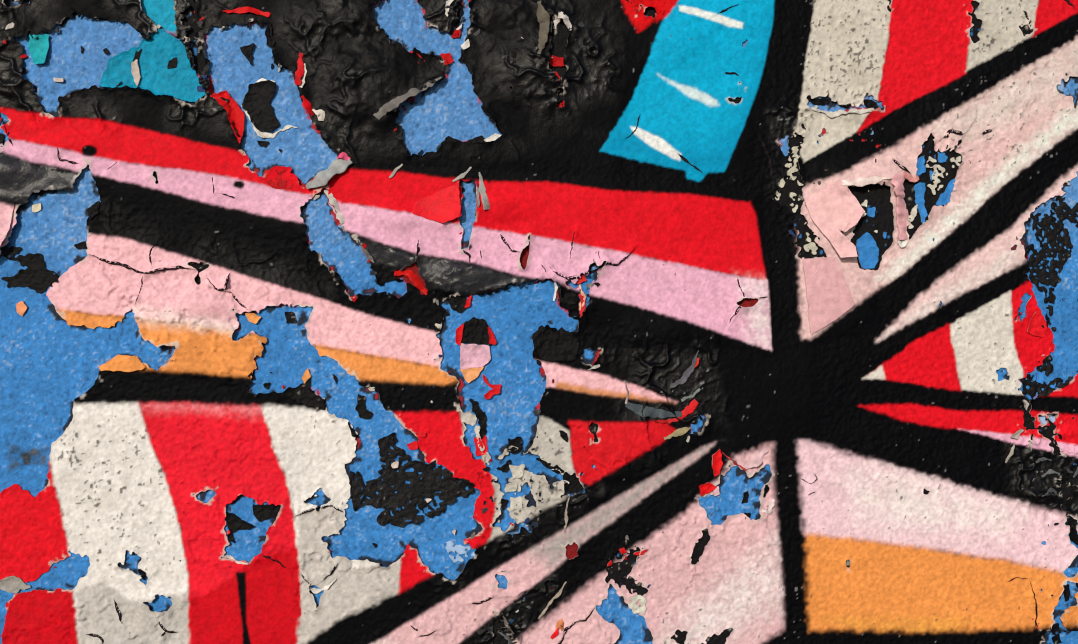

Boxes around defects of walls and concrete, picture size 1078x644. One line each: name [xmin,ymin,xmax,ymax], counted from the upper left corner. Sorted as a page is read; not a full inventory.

peeling [807,93,884,144]
peeling [772,123,962,335]
peeling [0,0,606,585]
peeling [996,171,1078,644]
peeling [691,449,775,564]
peeling [0,551,90,644]
crack [86,601,122,644]
peeling [143,594,172,612]
crack [158,621,176,637]
peeling [596,535,653,644]
peeling [671,629,688,644]
peeling [701,628,733,644]